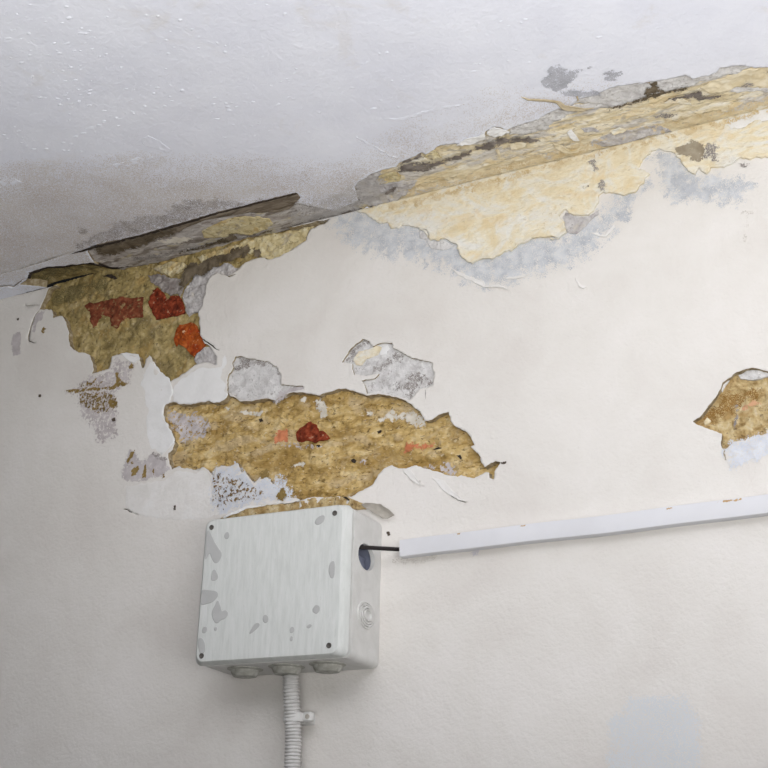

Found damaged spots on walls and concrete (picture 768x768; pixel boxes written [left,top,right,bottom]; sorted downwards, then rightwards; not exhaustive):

damp [0,64,623,299]
peeling [522,96,593,112]
peeling [27,107,768,521]